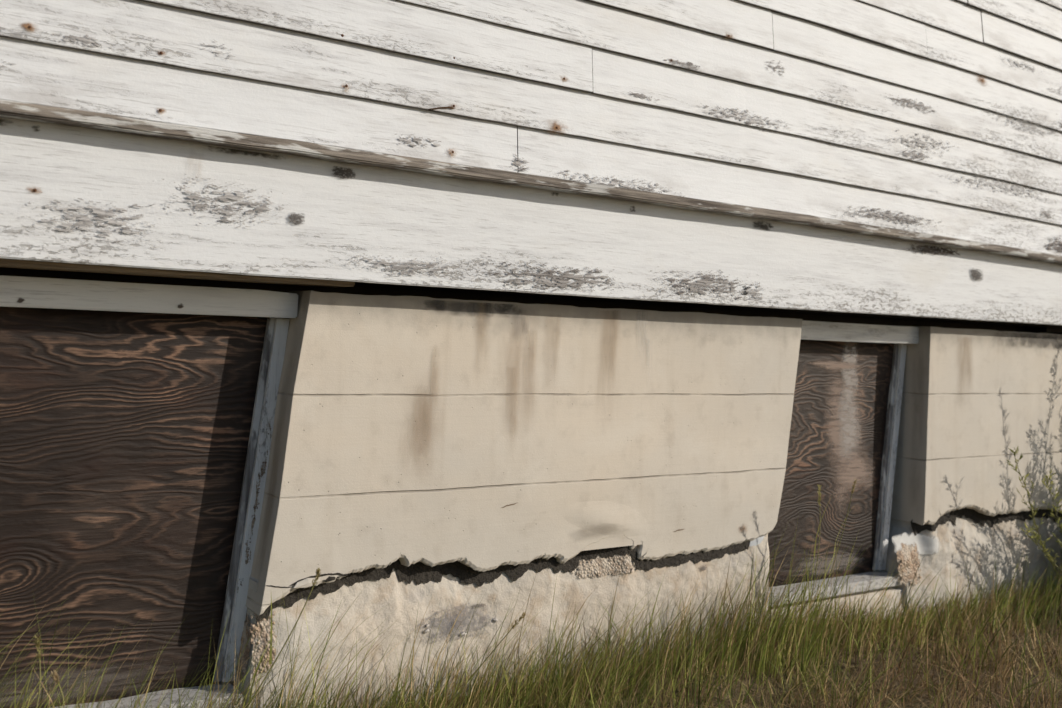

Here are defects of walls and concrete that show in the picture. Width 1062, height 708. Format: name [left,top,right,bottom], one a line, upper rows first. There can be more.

peeling [985,107,1062,139]
peeling [10,174,304,242]
peeling [836,205,936,226]
peeling [1041,236,1062,252]
peeling [334,250,473,277]
peeling [485,260,623,292]
peeling [650,266,766,301]
leakage [431,301,513,314]
crack [911,508,1062,536]
crack [254,529,751,622]
spalling [571,556,636,579]
spalling [236,611,276,682]